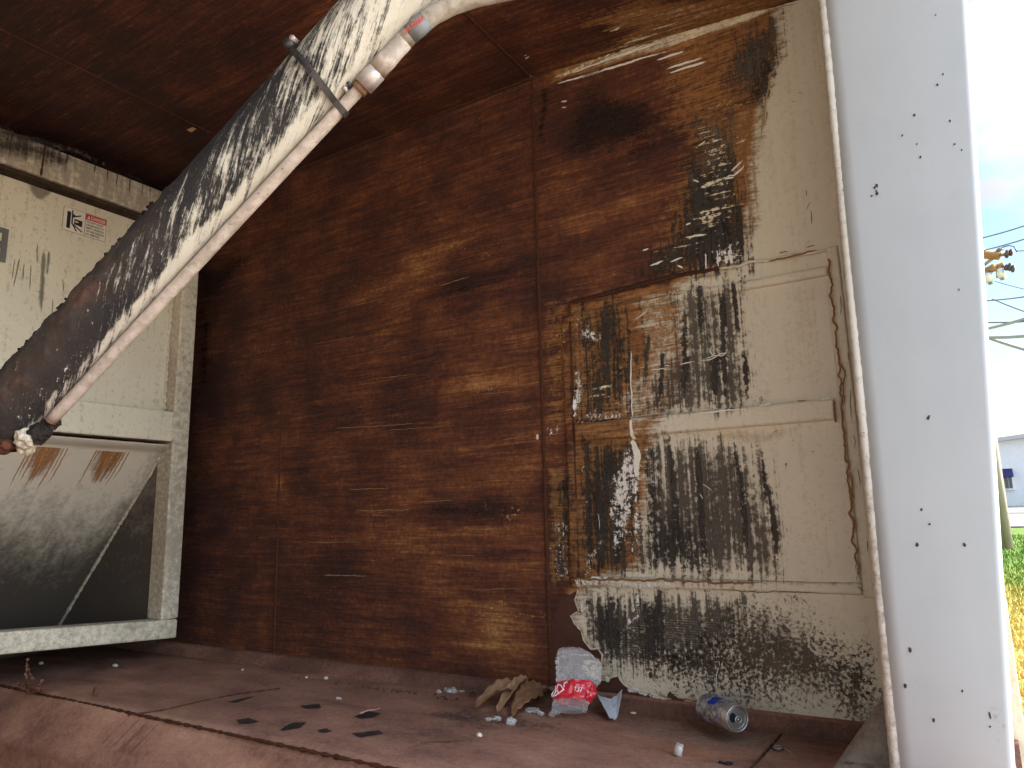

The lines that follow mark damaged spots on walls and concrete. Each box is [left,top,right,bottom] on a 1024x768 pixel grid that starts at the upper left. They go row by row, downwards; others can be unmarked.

water stain [575,53,778,423]
peeling [643,127,745,269]
peeling [573,371,621,422]
rust [12,435,80,489]
rust [77,439,141,485]
peeling [586,447,643,572]
water stain [549,432,883,722]
peeling [551,590,684,701]